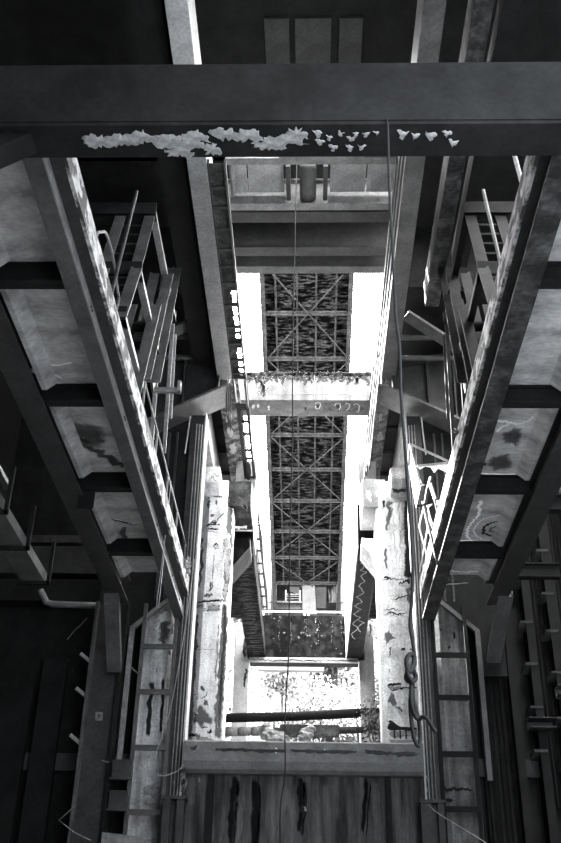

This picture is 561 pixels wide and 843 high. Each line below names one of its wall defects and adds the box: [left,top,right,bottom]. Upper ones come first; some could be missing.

peeling [81,127,379,158]
peeling [397,129,459,147]
leakage [74,424,124,468]
leakage [481,454,511,474]
leakage [496,416,534,446]
crack [384,576,409,617]
leakage [146,679,164,736]
leakage [227,777,240,843]
leakage [251,781,261,843]
leakage [297,778,307,835]